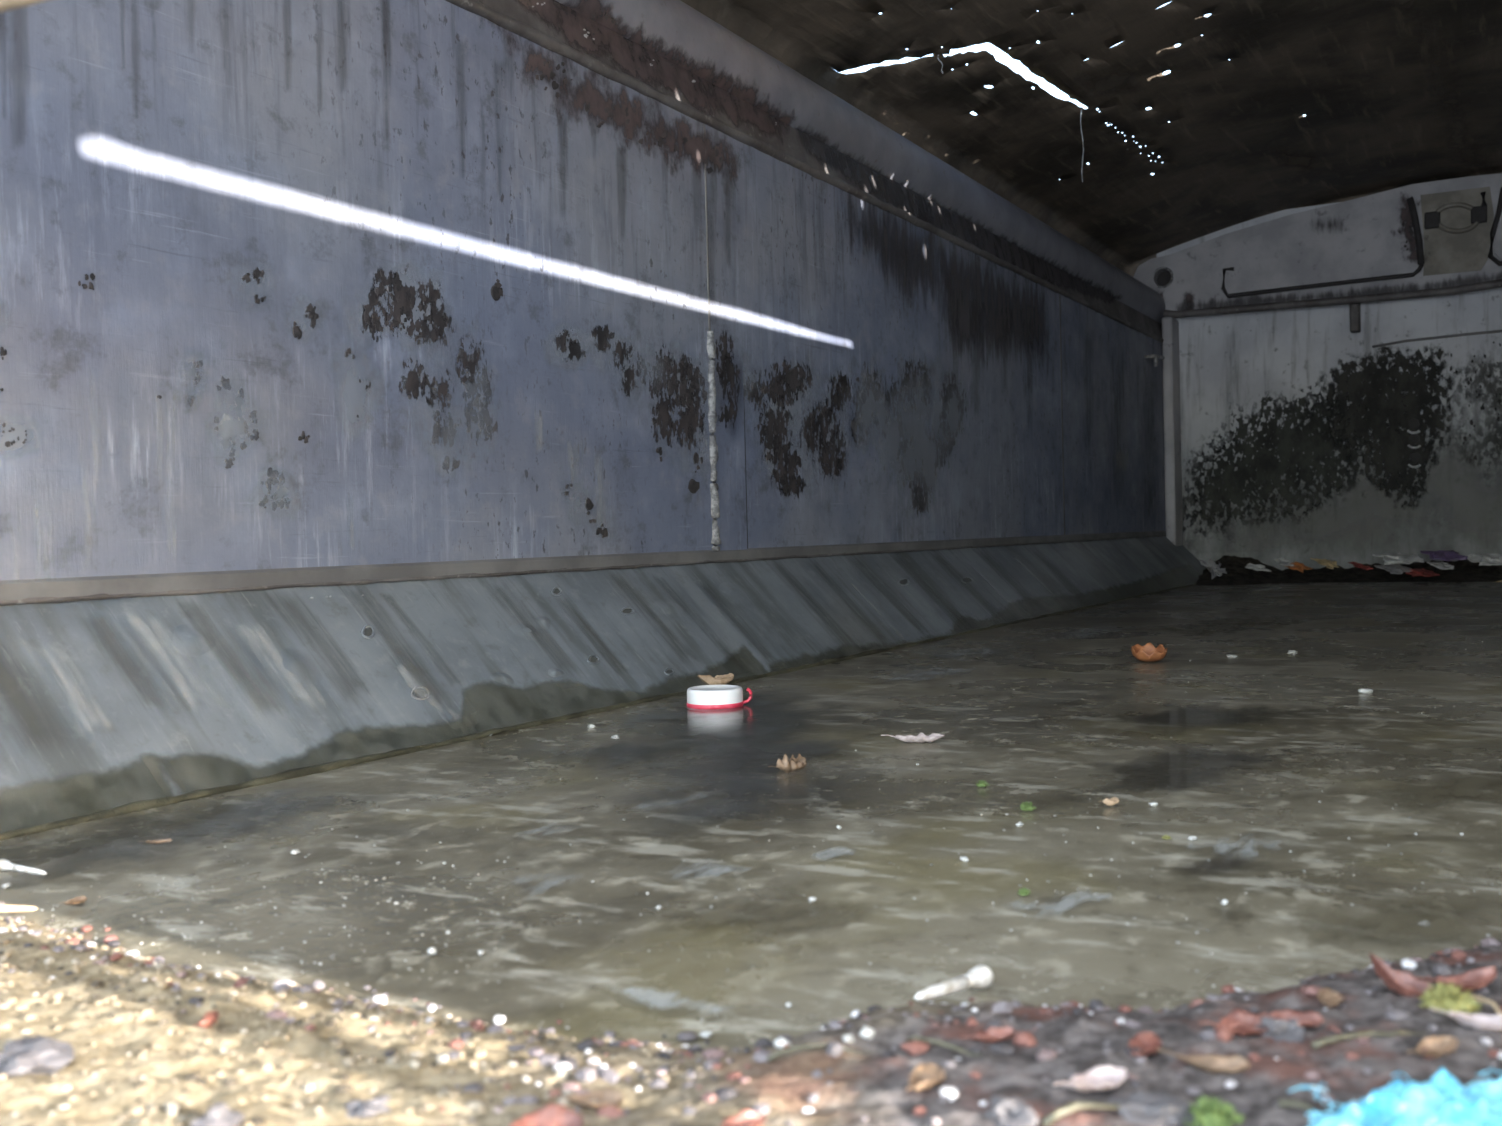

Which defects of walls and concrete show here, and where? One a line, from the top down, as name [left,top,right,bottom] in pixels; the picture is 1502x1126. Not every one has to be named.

corrosion [492,0,1122,303]
damp [848,193,1046,357]
damp [1182,341,1502,560]